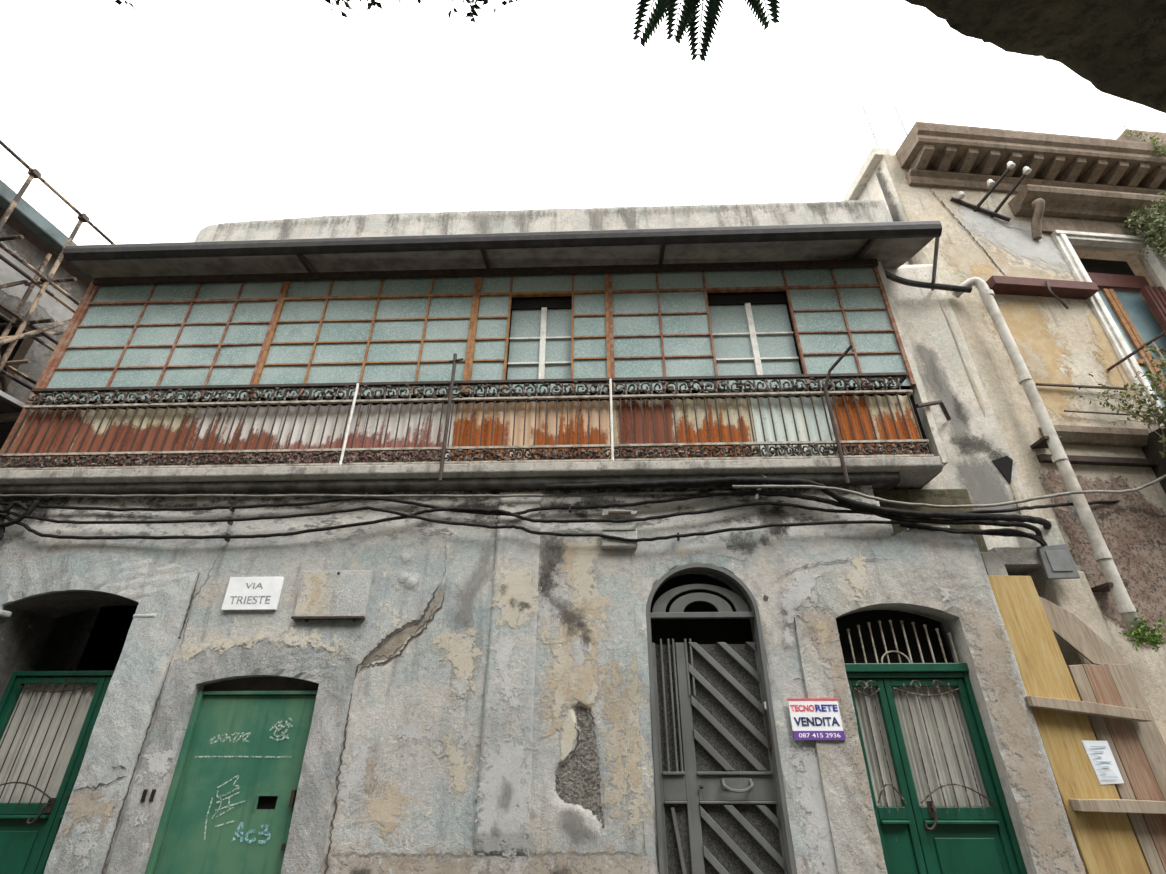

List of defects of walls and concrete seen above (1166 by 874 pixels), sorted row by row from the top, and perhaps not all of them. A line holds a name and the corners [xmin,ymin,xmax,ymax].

rust [1,409,508,468]
rust [531,399,752,460]
rust [830,396,924,455]
peeling [178,570,357,665]
leakage [538,537,591,642]
crack [324,541,474,874]
peeling [323,537,655,874]